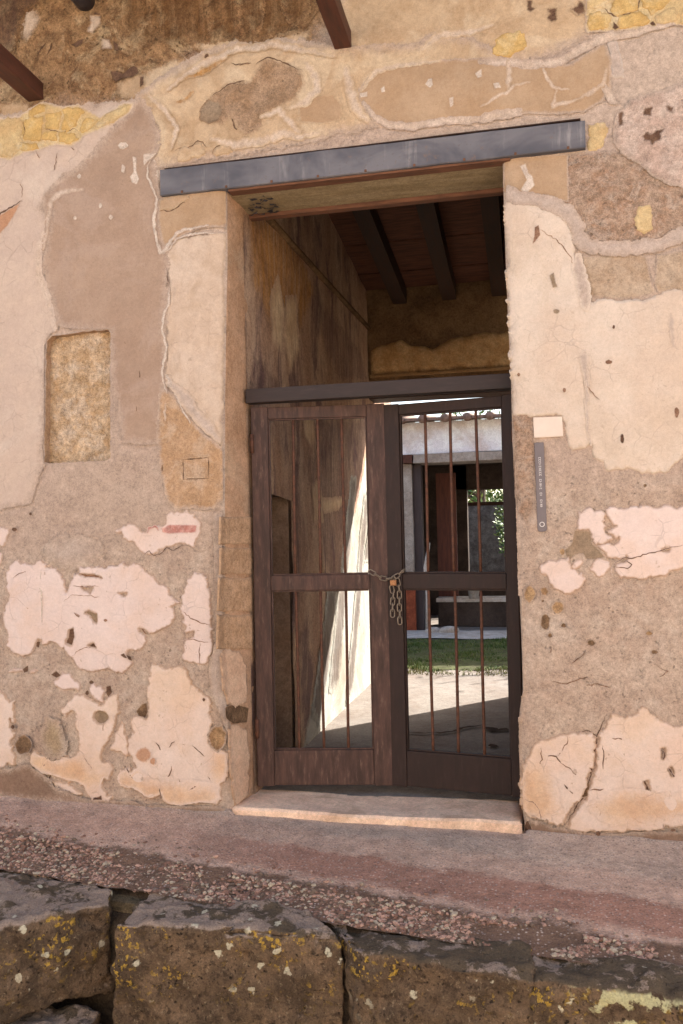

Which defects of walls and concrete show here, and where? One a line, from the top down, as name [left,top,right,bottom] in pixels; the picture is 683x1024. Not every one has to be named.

crack [479,60,618,110]
peeling [0,0,683,809]
crack [540,714,622,825]